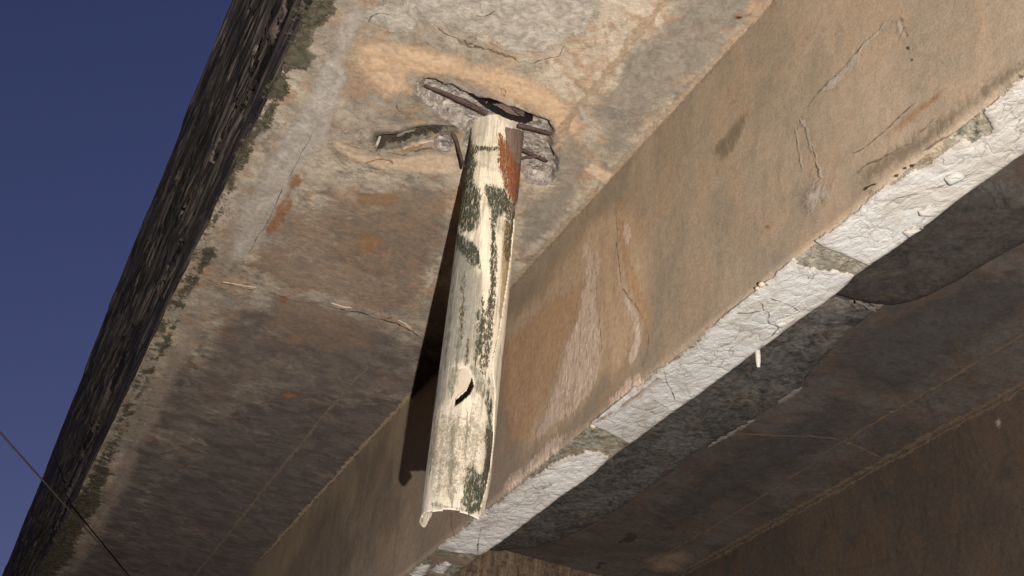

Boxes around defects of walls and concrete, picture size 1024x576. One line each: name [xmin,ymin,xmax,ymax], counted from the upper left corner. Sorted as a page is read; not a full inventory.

rust [267,175,301,233]
spalling [416,76,560,186]
water stain [597,0,747,152]
crack [800,16,913,154]
crack [851,102,959,177]
peeling [814,74,1024,266]
crack [221,282,418,336]
peeling [590,217,854,444]
water stain [72,297,437,576]